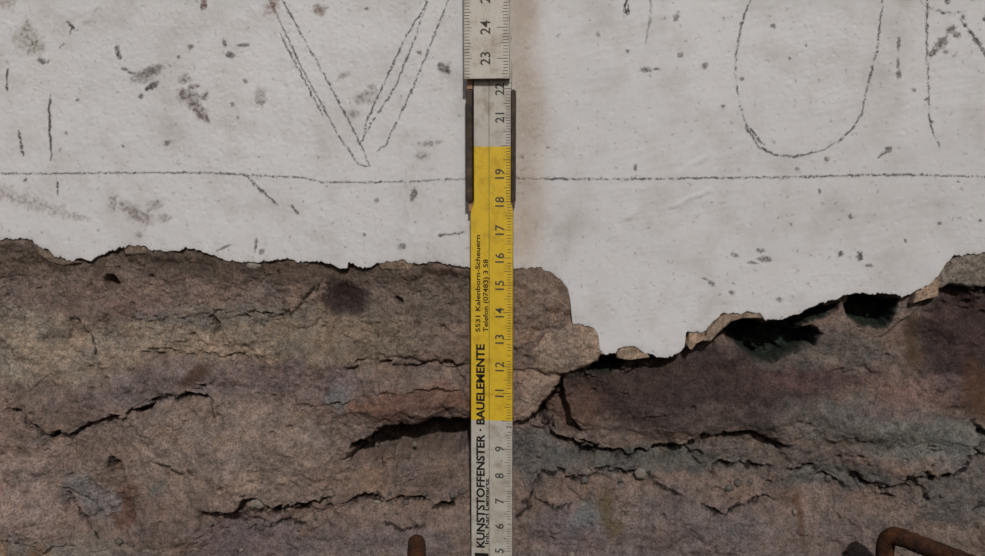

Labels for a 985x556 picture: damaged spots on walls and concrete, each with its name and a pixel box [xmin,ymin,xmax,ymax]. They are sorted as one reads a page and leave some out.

crack [21,384,215,437]
spalling [0,238,471,556]
spalling [513,252,985,556]
crack [350,424,387,456]
crack [516,409,776,517]
crack [700,430,880,488]
crack [905,457,972,483]
crack [350,493,455,531]